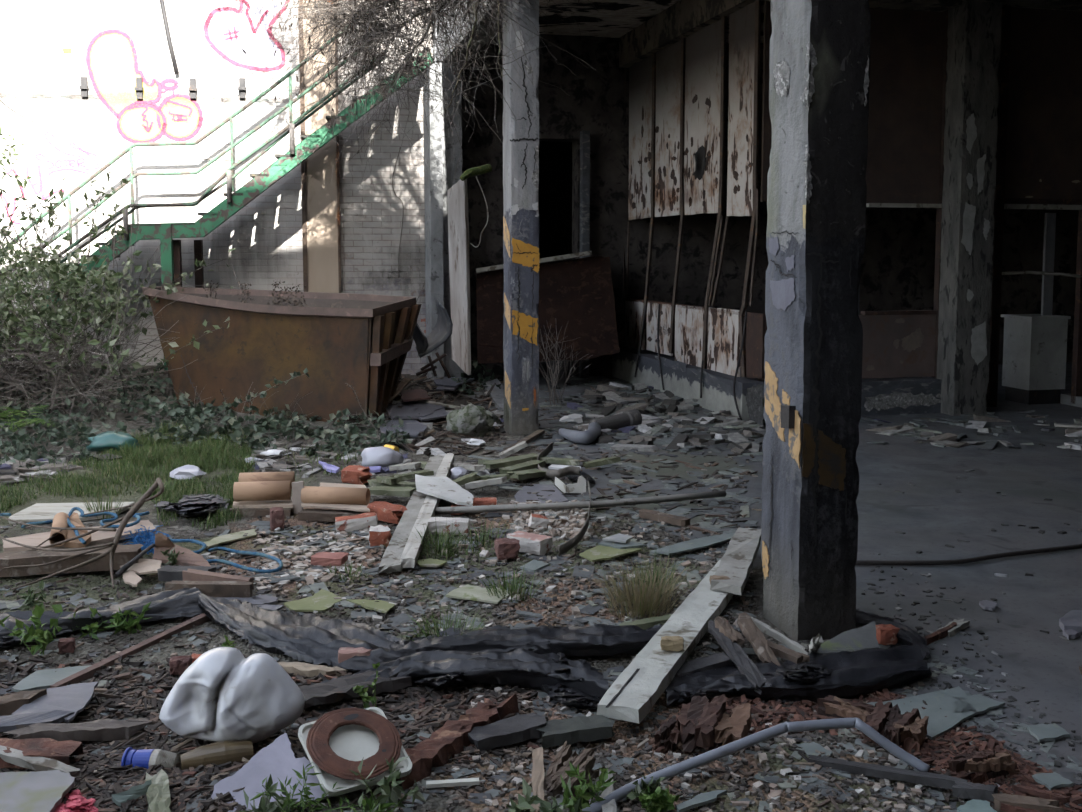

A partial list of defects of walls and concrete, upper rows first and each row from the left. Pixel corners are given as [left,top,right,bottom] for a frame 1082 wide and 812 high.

crack [509,57,538,189]
peeling [961,113,991,255]
crack [512,217,538,380]
peeling [769,237,795,312]
peeling [971,321,987,365]